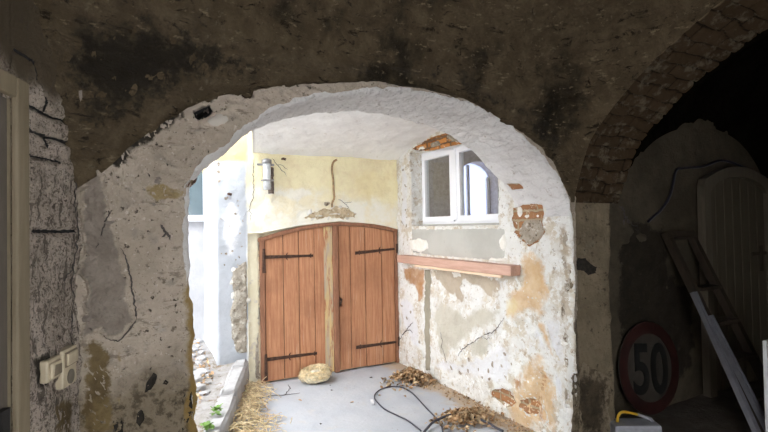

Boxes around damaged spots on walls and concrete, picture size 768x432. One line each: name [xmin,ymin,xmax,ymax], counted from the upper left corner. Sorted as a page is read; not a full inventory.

flaking render [413,133,462,151]
damp [50,331,128,432]
flaking render [78,170,137,342]
flaking render [219,196,260,379]
flaking render [305,202,356,221]
crack [441,318,504,360]
flaking render [434,339,542,414]
damp [432,245,566,432]
flaking render [510,204,546,246]
flaking render [556,222,596,401]